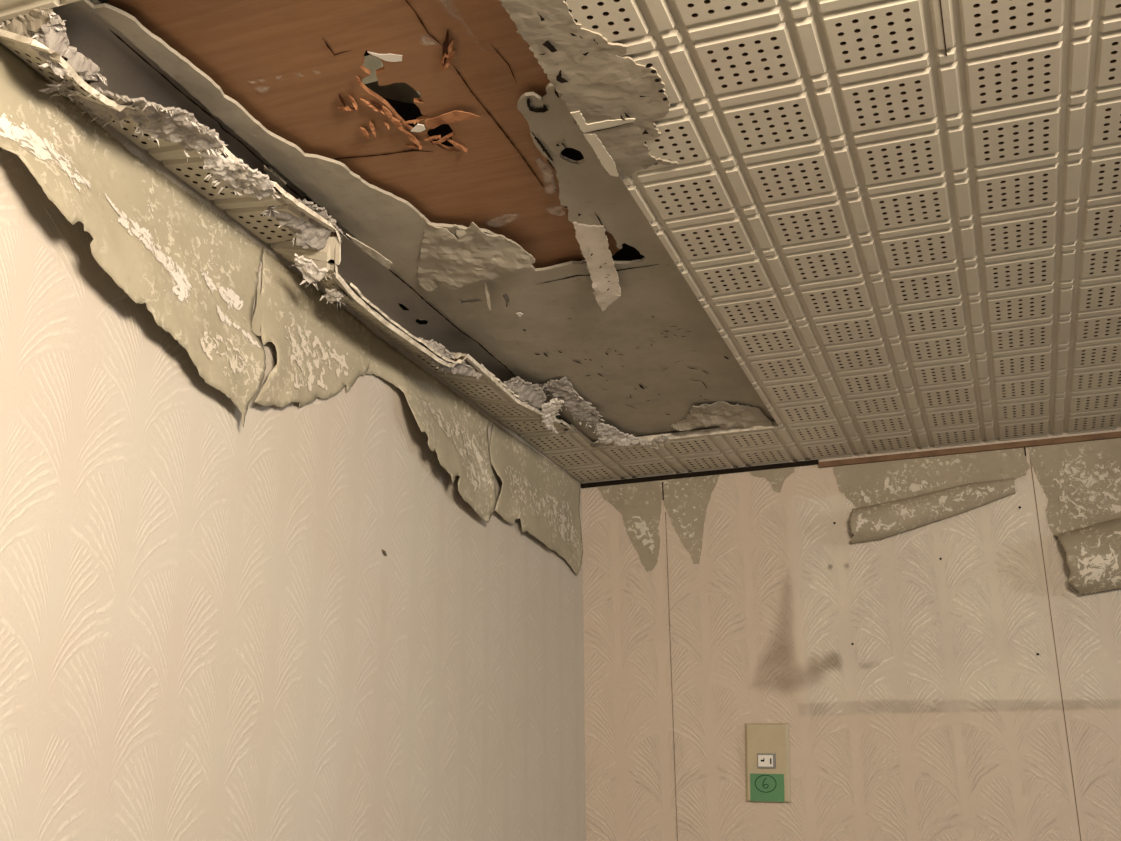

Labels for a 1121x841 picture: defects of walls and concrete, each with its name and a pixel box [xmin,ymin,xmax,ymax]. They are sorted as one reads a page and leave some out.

peeling [499,0,678,177]
peeling [344,279,457,364]
peeling [479,363,541,409]
peeling [598,474,720,572]
peeling [833,438,1121,539]